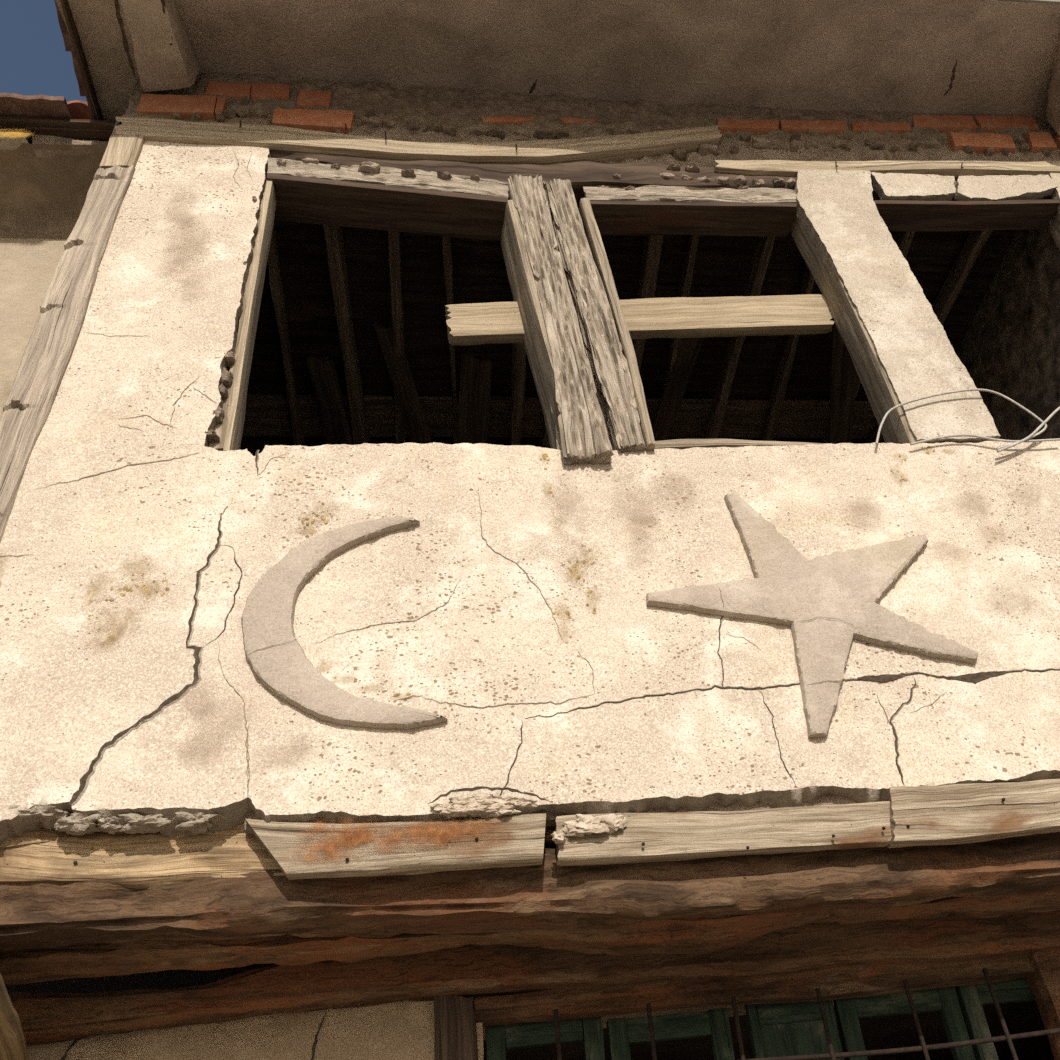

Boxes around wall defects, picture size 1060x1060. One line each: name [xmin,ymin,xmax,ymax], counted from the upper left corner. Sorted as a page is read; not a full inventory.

crack [944,59,957,95]
spalling [205,186,266,451]
crack [118,380,216,431]
crack [37,452,200,489]
crack [68,506,250,805]
crack [394,487,960,804]
crack [1006,666,1060,674]
spalling [9,803,224,835]
spalling [430,794,537,819]
crack [311,1011,327,1060]